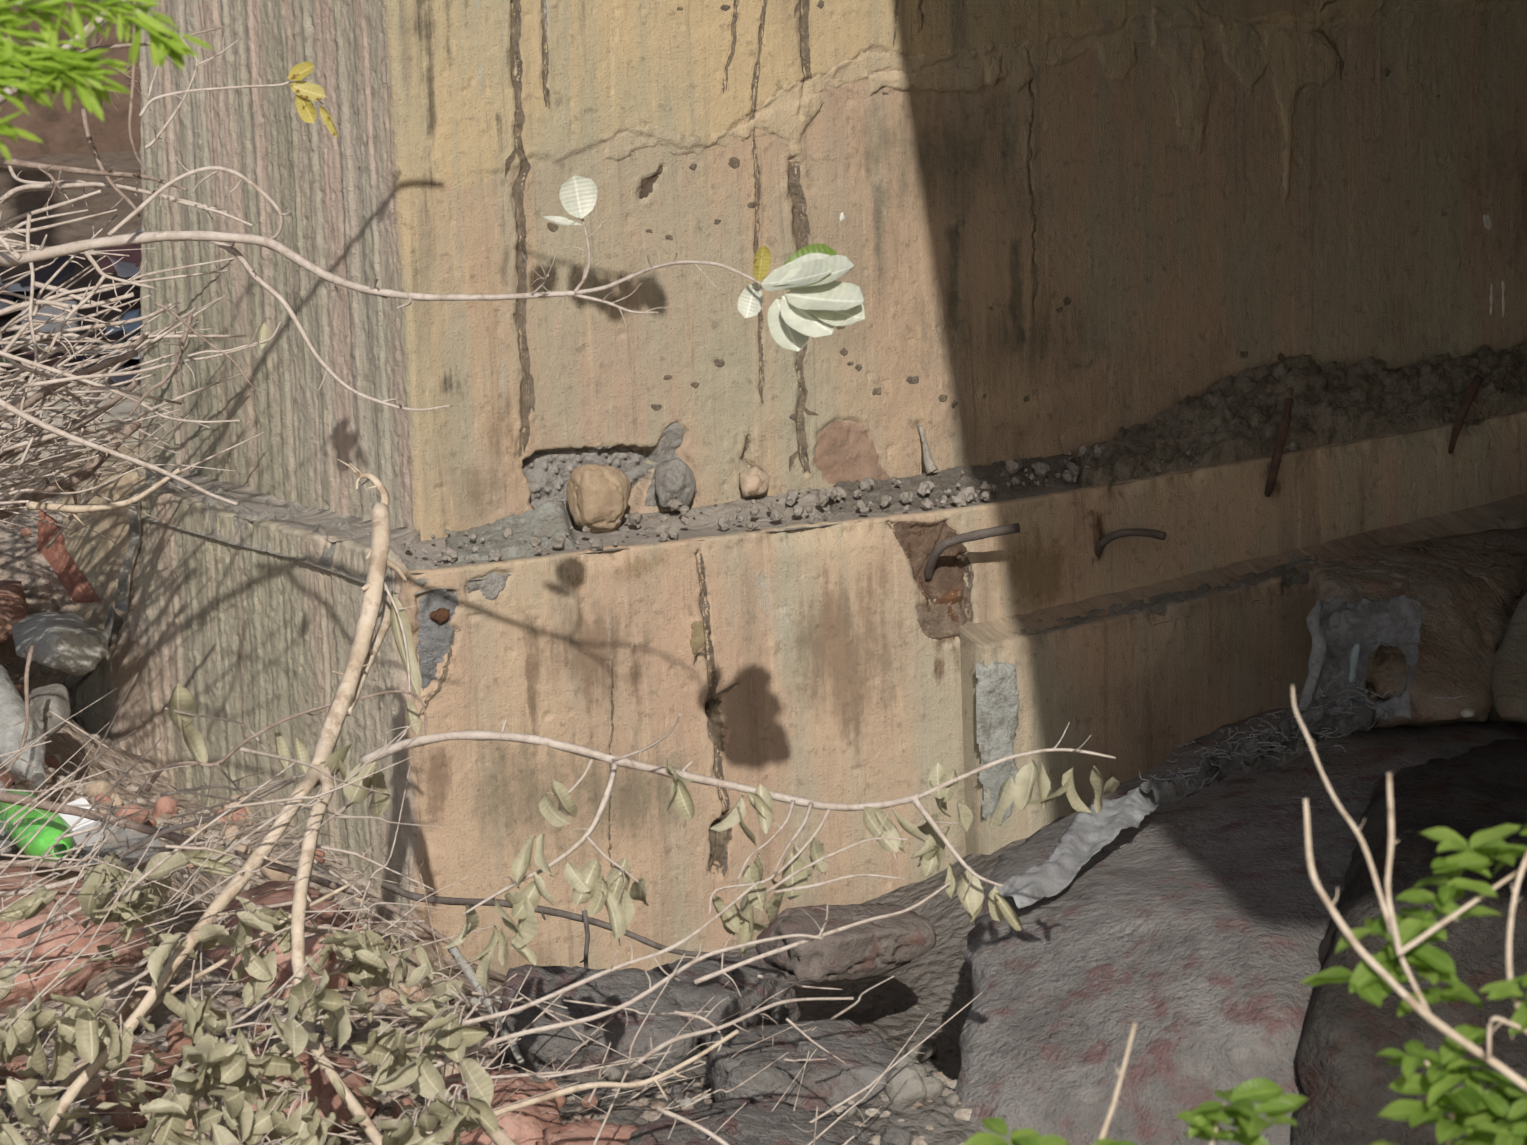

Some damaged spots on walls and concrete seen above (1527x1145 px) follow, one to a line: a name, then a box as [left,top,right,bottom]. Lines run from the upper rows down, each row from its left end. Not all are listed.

spalling [37,420,890,731]
crack [505,0,550,457]
crack [693,553,740,877]
crack [722,0,818,473]
spalling [840,348,862,371]
spalling [917,424,938,474]
rust [925,589,962,641]
spalling [1264,398,1293,497]